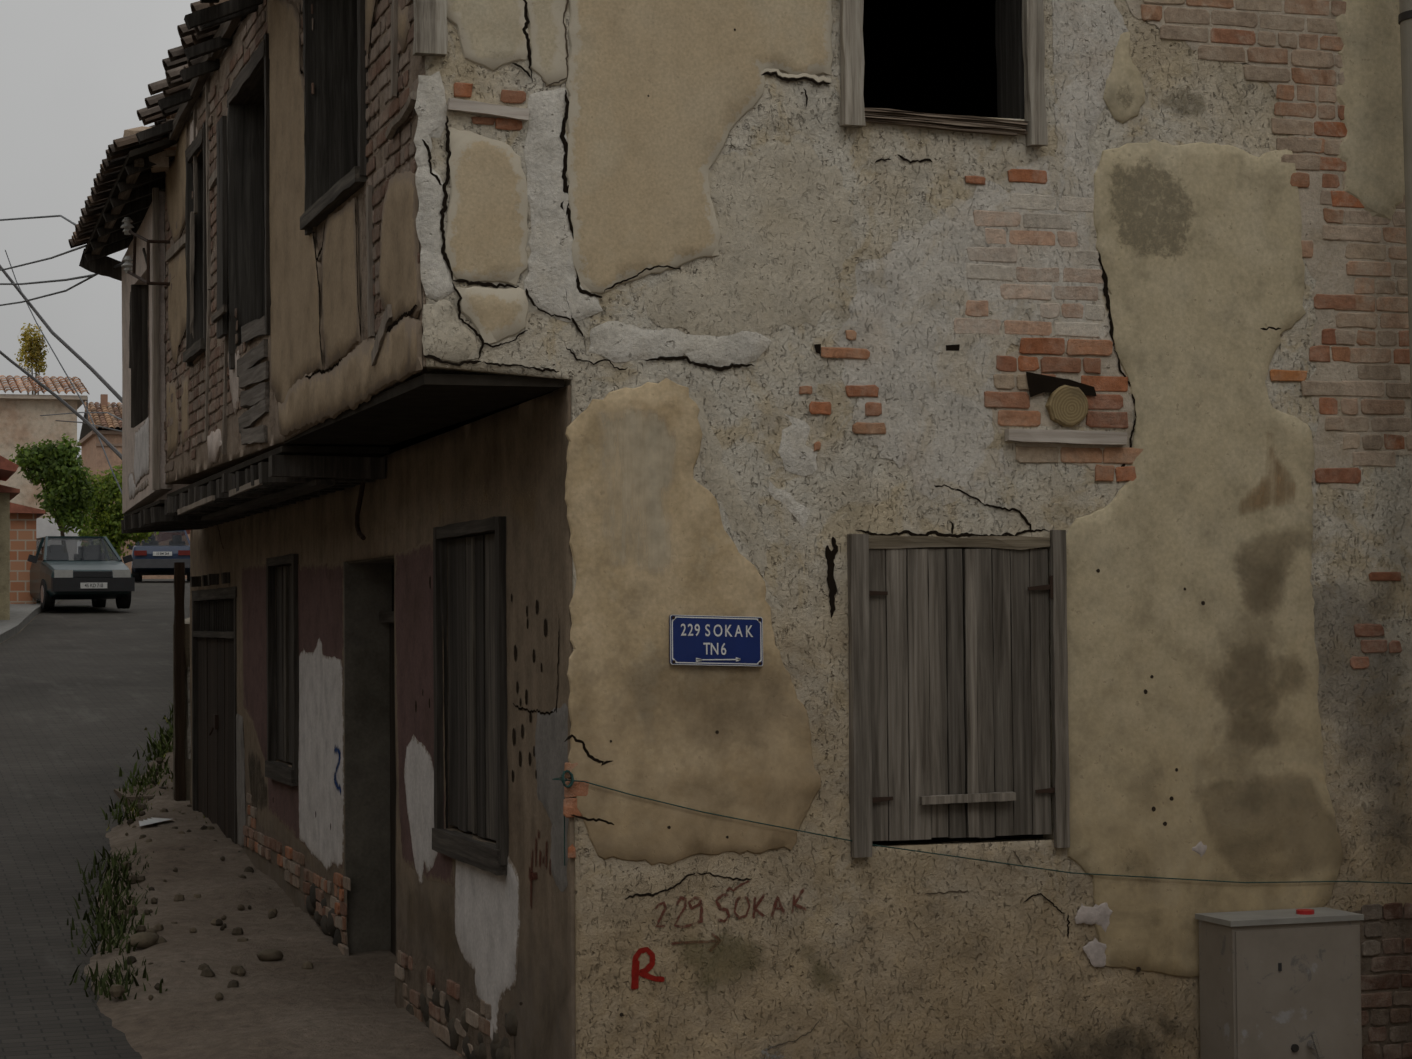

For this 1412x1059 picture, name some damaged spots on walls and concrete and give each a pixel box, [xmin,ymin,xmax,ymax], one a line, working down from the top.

crack [305,209,417,379]
crack [368,0,377,59]
flaking render [364,0,419,334]
crack [422,0,754,373]
crack [760,68,831,107]
spalling [799,386,831,415]
spalling [814,330,870,359]
spalling [845,385,886,434]
flaking render [946,169,1143,482]
flaking render [1126,0,1412,491]
crack [825,484,1048,617]
flaking render [243,793,351,956]